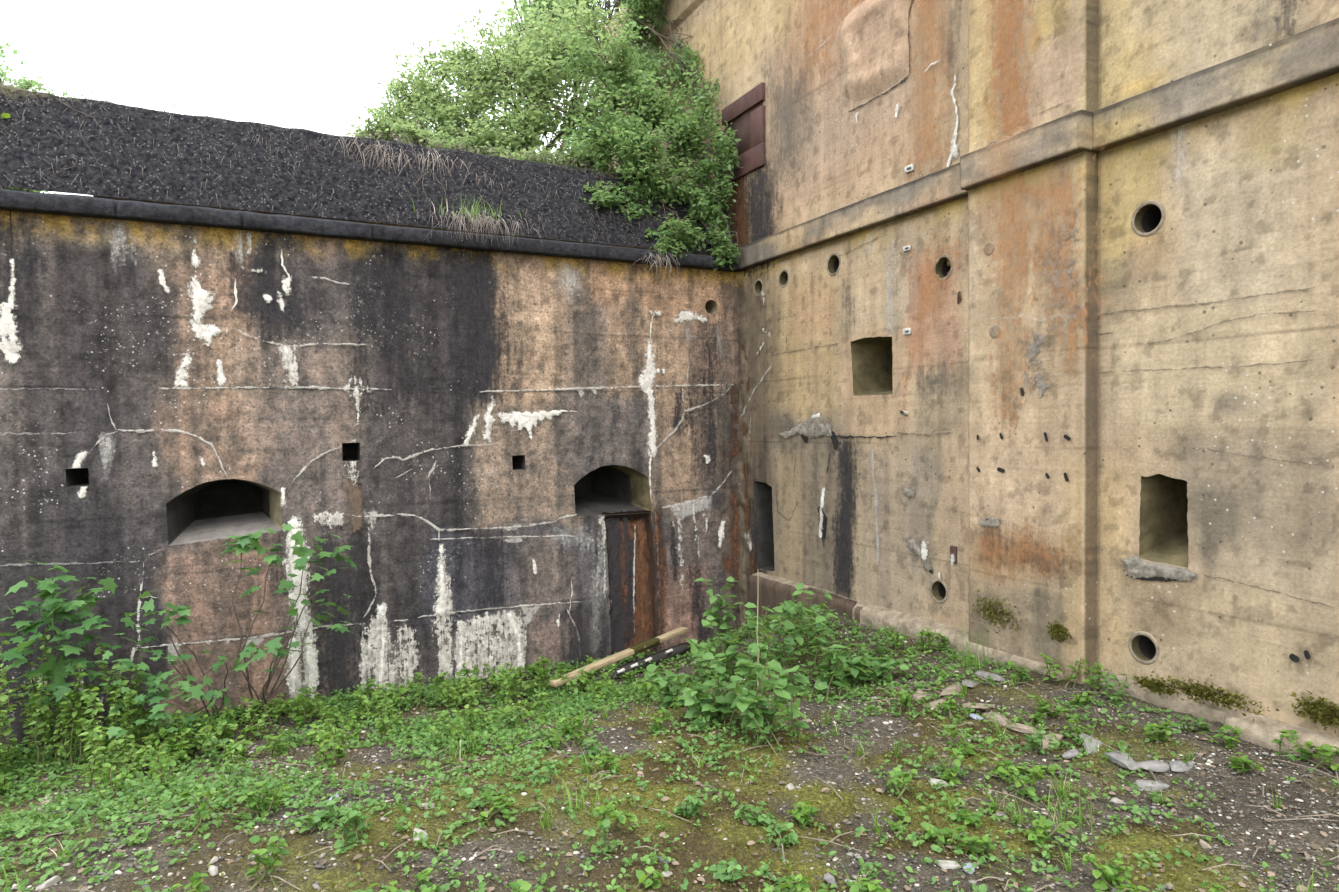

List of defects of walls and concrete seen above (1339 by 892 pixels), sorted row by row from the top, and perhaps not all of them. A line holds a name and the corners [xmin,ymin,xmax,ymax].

crack [841,0,914,112]
water stain [946,74,958,167]
water stain [0,213,43,363]
water stain [273,461,527,698]
water stain [555,516,606,668]
rust [597,510,669,655]
water stain [817,438,879,598]